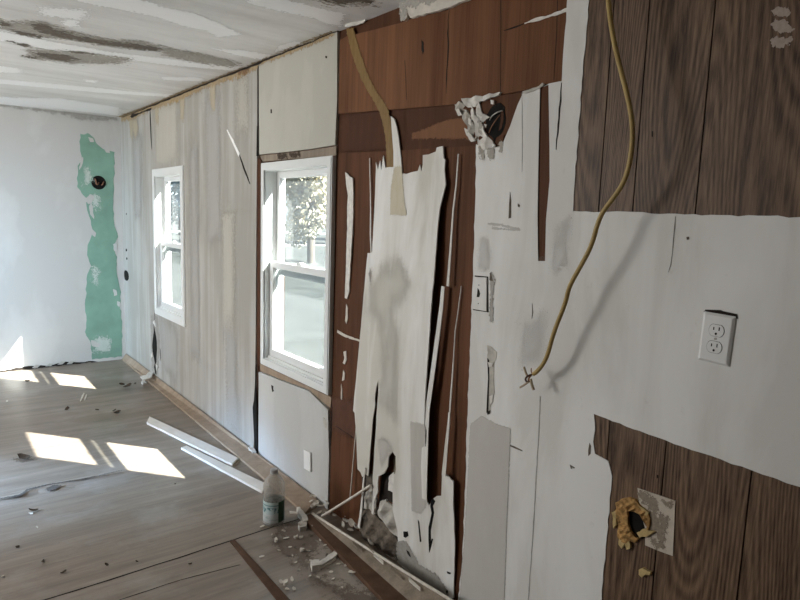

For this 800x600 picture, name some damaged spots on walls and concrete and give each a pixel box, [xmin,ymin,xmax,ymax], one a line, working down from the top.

peeling [77,133,129,359]
leakage [0,18,334,437]
spalling [360,472,408,570]